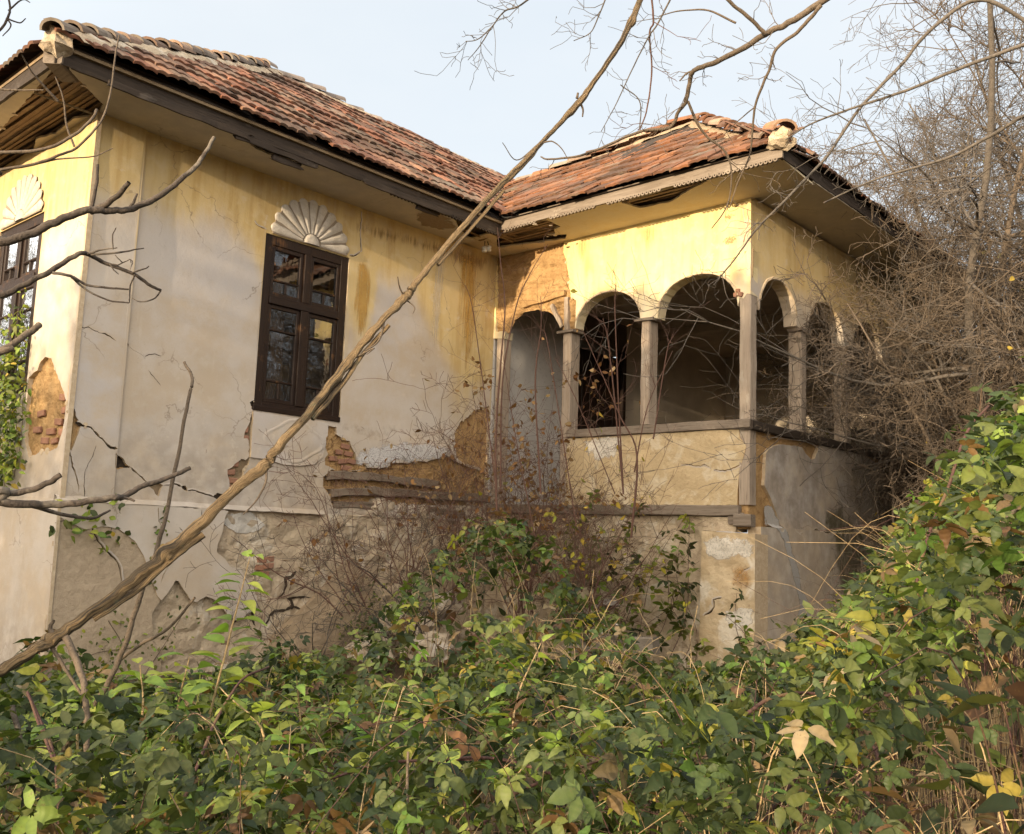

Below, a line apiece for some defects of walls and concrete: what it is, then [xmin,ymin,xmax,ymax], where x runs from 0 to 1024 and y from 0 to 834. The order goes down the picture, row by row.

flaking render [463,220,579,333]
flaking render [24,358,88,456]
crack [69,421,214,515]
leakage [357,442,448,467]
flaking render [152,407,488,675]
crack [234,571,310,625]